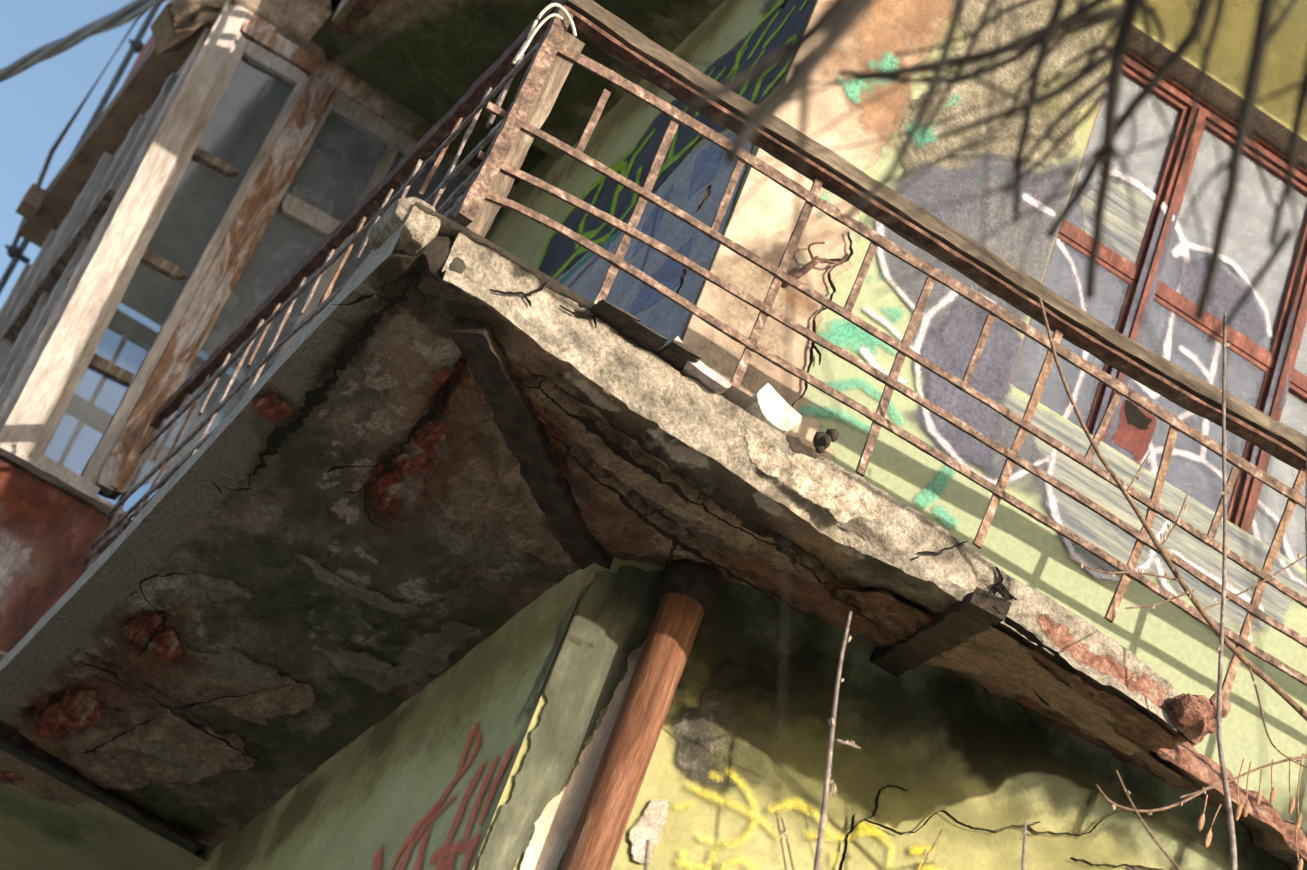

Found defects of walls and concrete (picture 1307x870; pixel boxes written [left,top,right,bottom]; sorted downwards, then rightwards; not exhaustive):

spalling [334,0,381,36]
peeling [775,0,1114,182]
peeling [682,148,881,523]
crack [26,573,290,763]
peeling [0,612,316,806]
peeling [370,359,579,574]
crack [514,379,889,642]
peeling [478,364,930,870]
water stain [678,581,1196,843]
crack [838,785,1163,870]